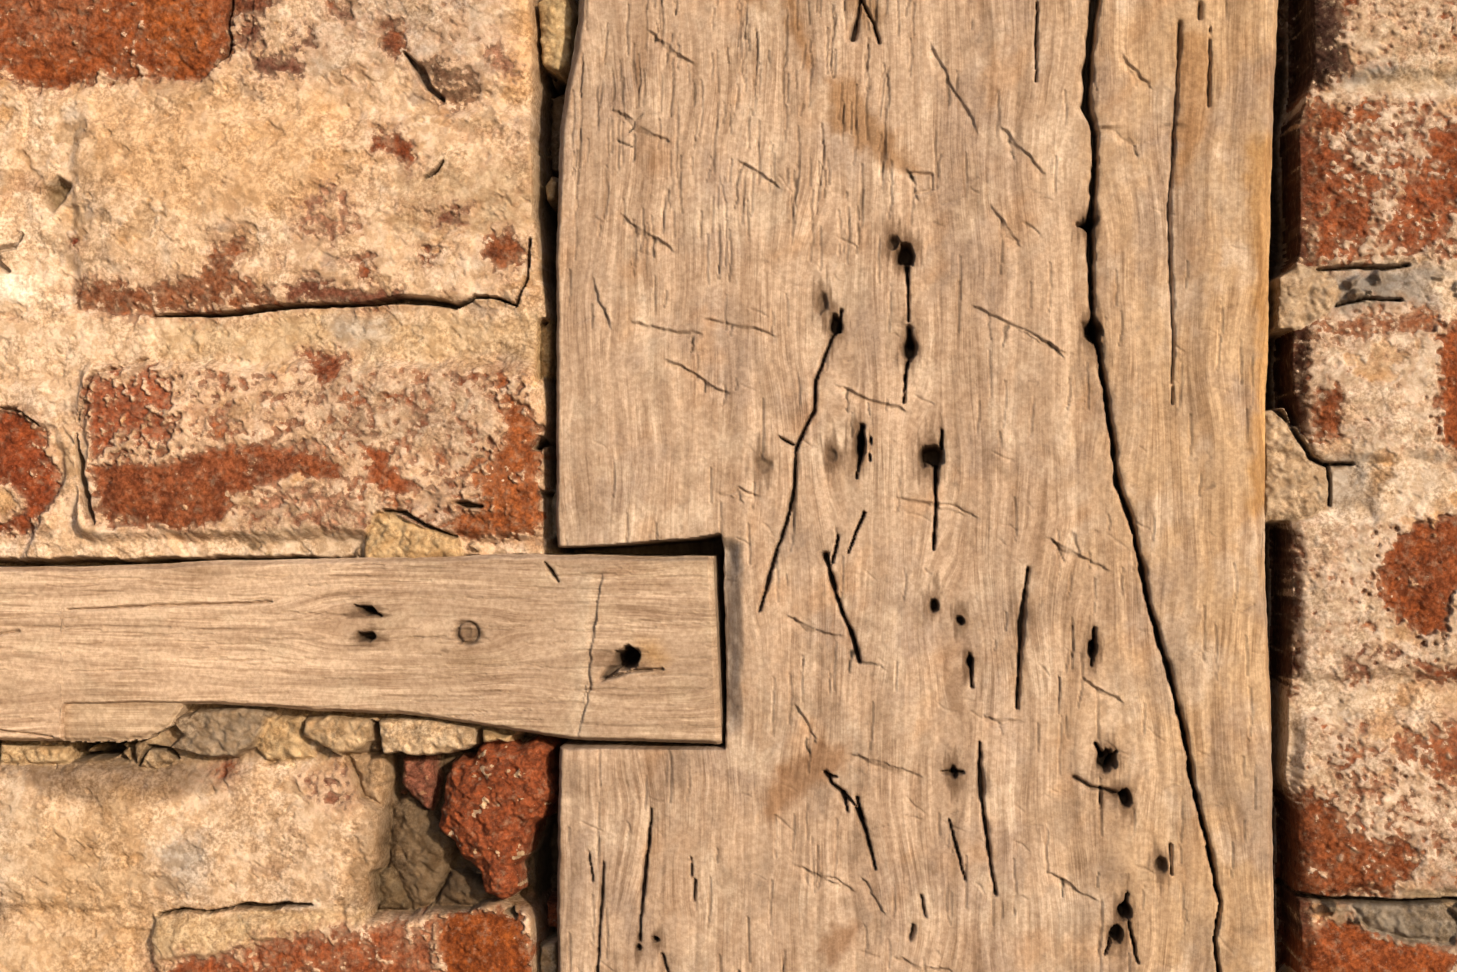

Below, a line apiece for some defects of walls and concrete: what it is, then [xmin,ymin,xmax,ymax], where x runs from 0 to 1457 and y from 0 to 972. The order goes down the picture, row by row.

crack [406,55,445,102]
crack [155,297,519,318]
crack [1322,264,1411,307]
crack [79,359,149,422]
crack [0,408,40,427]
crack [1268,409,1355,507]
crack [81,458,95,526]
spalling [151,734,570,972]
crack [158,901,313,918]